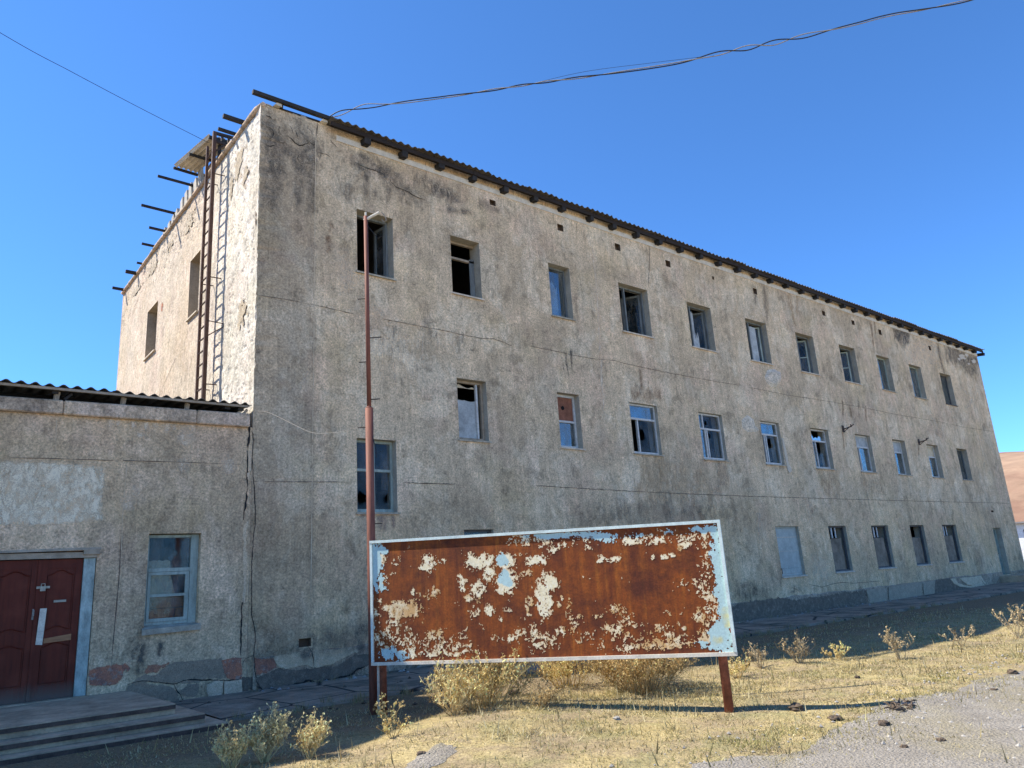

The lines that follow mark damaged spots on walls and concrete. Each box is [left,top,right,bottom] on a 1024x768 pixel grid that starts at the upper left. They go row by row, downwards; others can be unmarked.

crack [123,114,353,700]
flaking render [88,647,369,702]
crack [293,645,364,685]